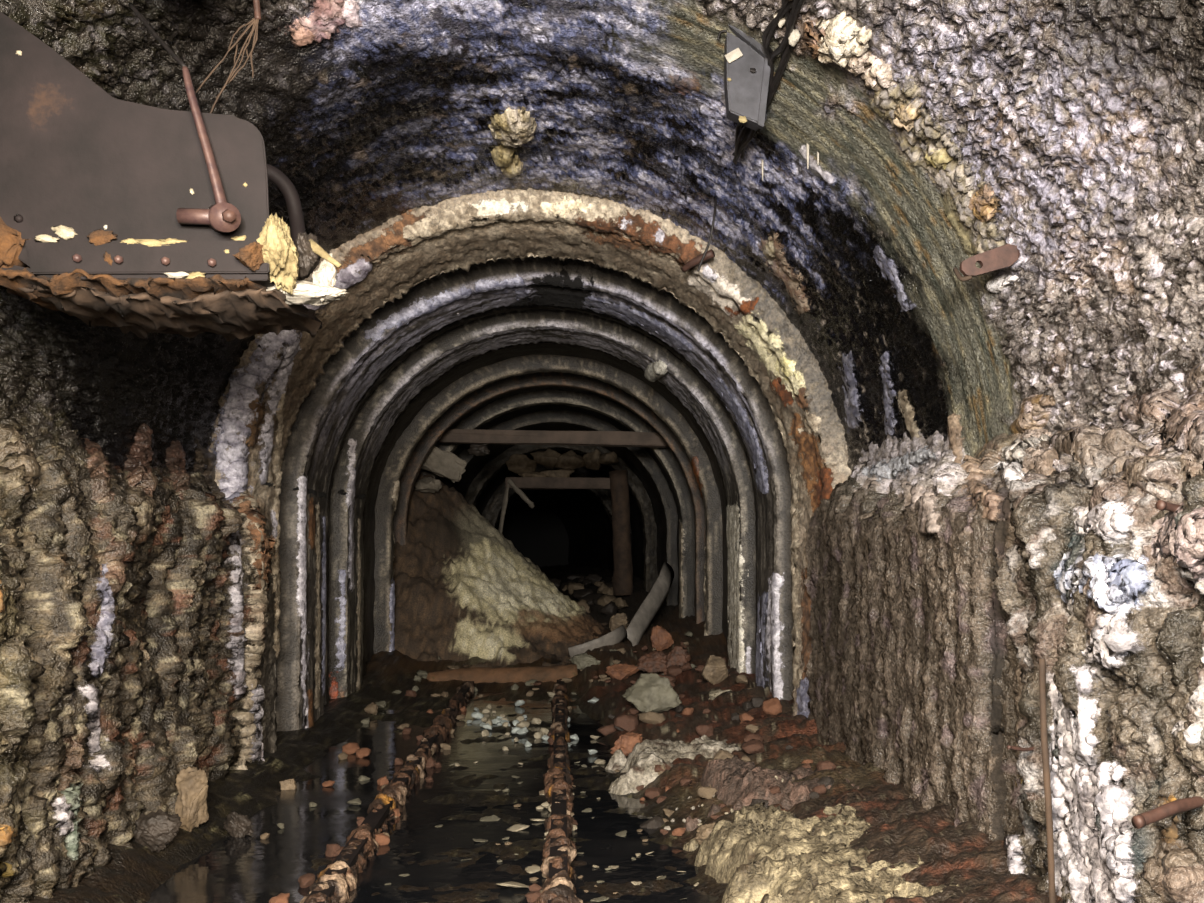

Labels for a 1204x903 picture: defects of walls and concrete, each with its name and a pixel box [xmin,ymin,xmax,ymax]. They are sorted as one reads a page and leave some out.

damp [799,145,834,184]
damp [869,75,1006,255]
rust [574,210,715,272]
damp [616,299,694,353]
rust [720,297,759,319]
damp [758,233,811,315]
damp [873,245,916,312]
damp [838,351,864,429]
damp [711,378,769,495]
rust [769,377,834,512]
damp [224,385,286,770]
rust [800,568,812,717]